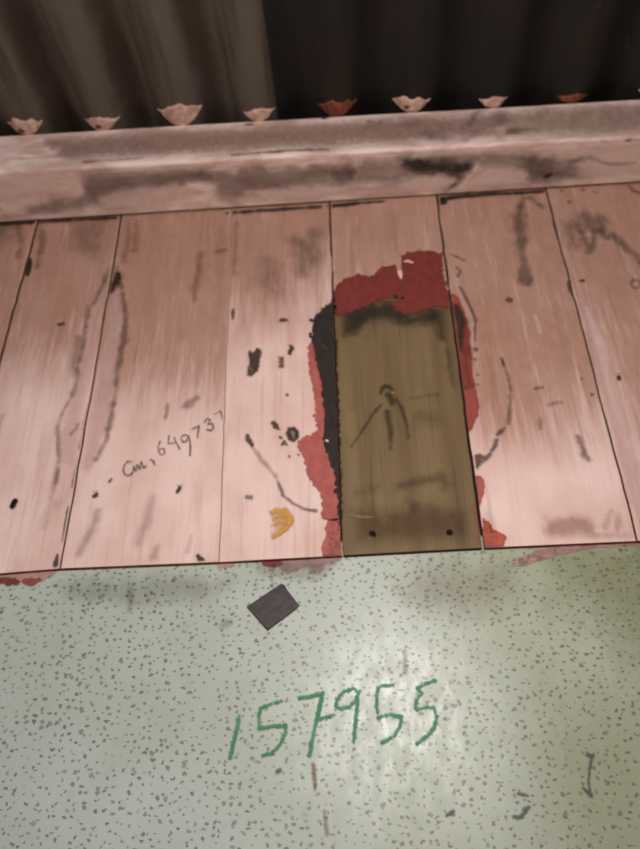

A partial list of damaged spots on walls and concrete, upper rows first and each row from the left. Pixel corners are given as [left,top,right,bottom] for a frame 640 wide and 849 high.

water stain [404,159,473,189]
peeling [271,250,480,556]
peeling [474,454,507,546]